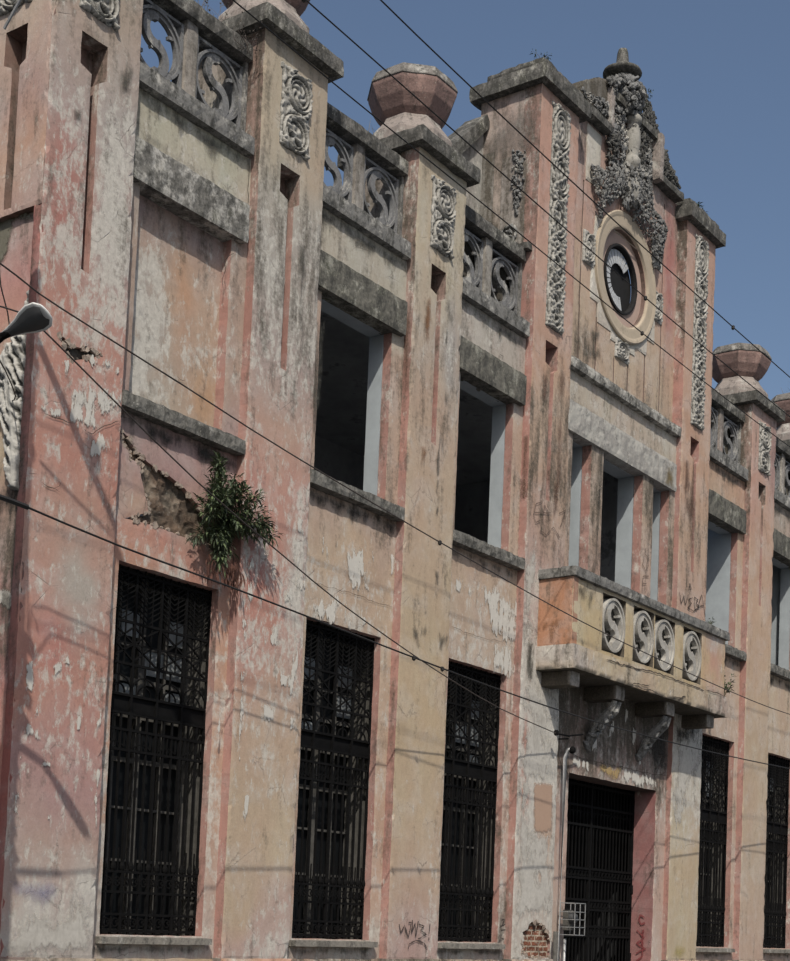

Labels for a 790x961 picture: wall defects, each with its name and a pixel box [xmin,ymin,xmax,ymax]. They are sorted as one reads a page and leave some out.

flaking render [57,331,119,378]
flaking render [35,385,220,557]
peeling [347,548,374,590]
peeling [313,595,366,630]
peeling [451,553,535,678]
peeling [25,661,34,691]
peeling [280,636,301,695]
peeling [517,684,558,960]